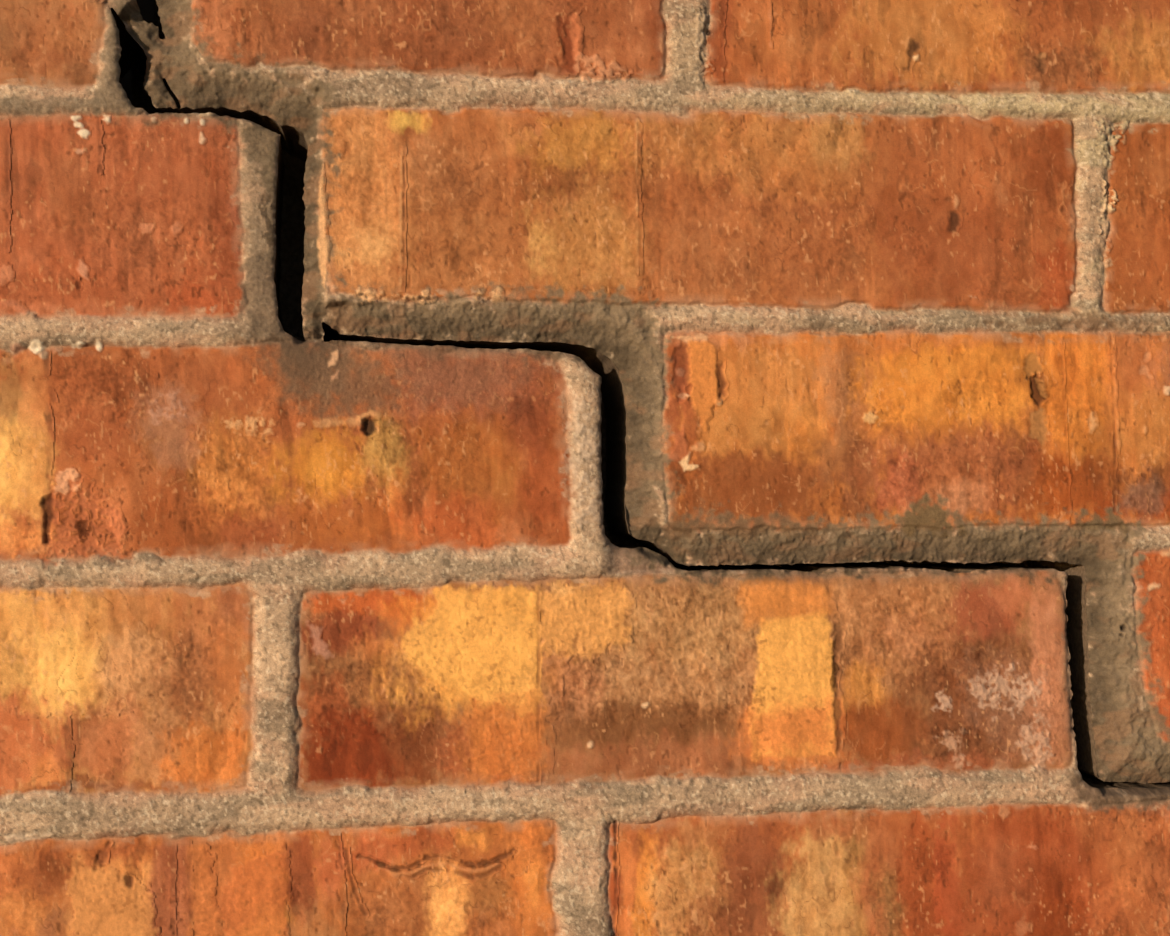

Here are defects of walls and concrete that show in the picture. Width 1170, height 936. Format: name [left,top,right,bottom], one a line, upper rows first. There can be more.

crack [110,0,1170,789]